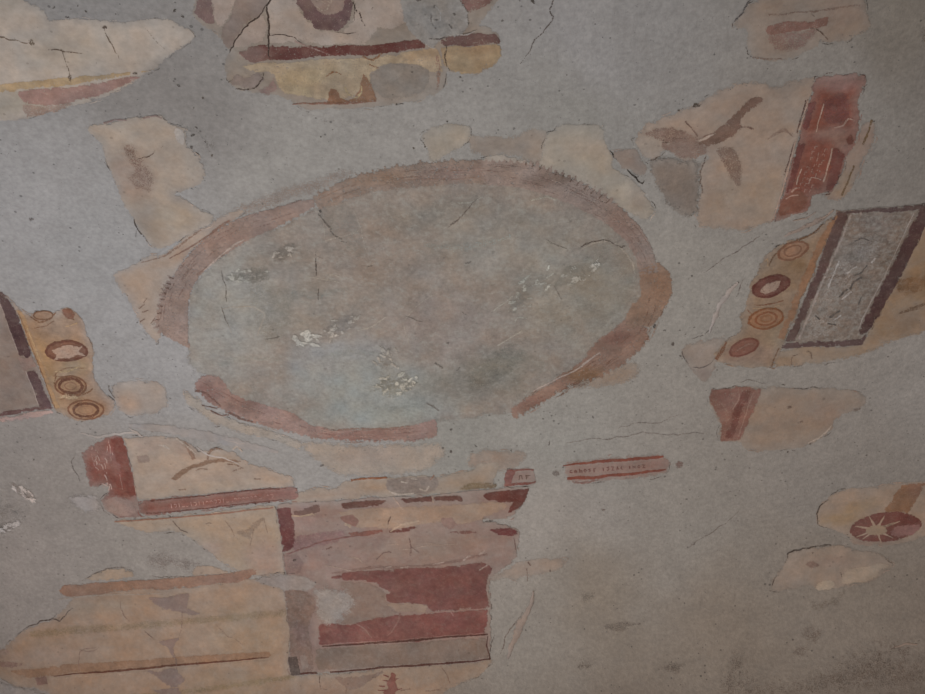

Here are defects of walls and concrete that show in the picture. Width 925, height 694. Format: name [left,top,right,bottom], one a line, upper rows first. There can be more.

crack [229,0,300,91]
crack [520,1,554,64]